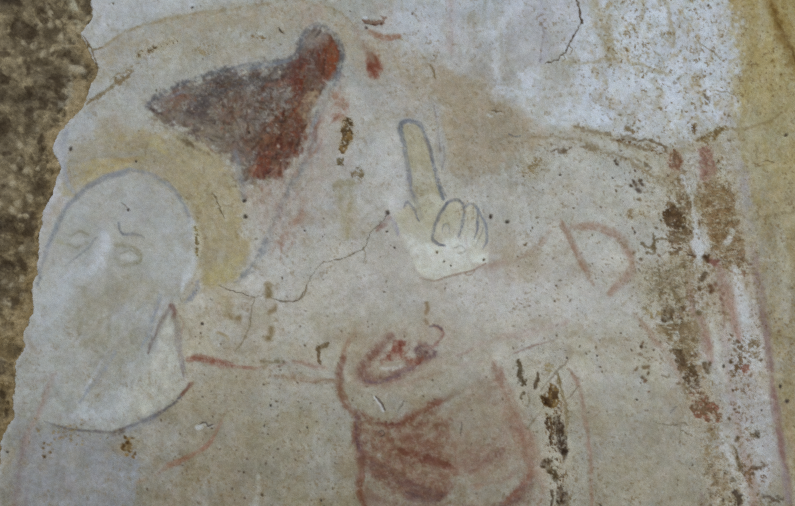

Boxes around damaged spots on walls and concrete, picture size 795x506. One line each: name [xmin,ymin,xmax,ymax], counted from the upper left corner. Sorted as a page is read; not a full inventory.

crack [544,0,584,65]
crack [218,215,386,304]
peeling [513,118,787,506]